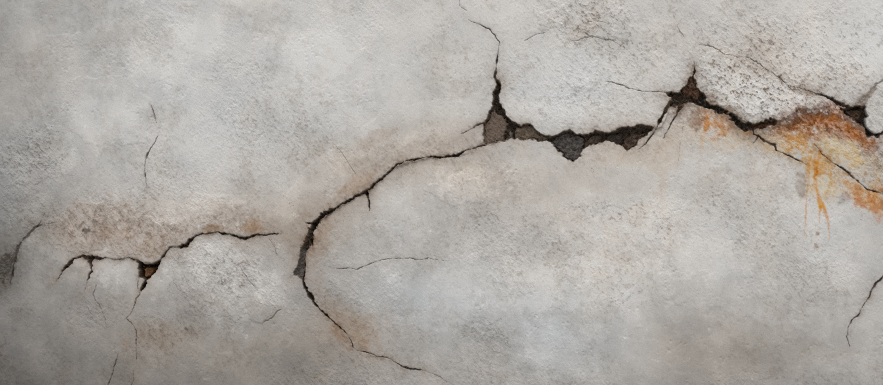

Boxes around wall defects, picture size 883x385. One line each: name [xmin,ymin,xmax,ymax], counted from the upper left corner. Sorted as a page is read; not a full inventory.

crack [293,1,883,377]
rust [687,94,883,249]
crack [0,216,55,288]
crack [57,231,282,322]
crack [108,294,140,385]